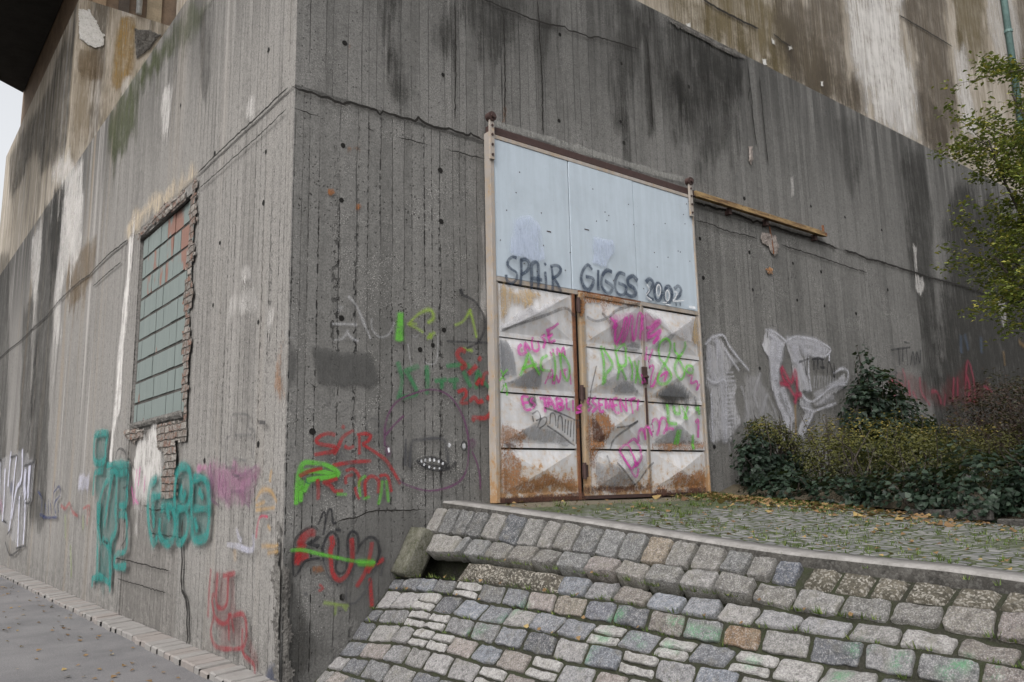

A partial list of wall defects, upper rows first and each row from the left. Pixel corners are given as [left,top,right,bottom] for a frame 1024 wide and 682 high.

crack [199,4,485,187]
damp [673,0,981,154]
damp [29,153,83,526]
spalling [123,178,198,499]
crack [695,202,1009,301]
damp [903,159,1024,447]
rust [586,411,615,466]
rust [500,424,706,503]